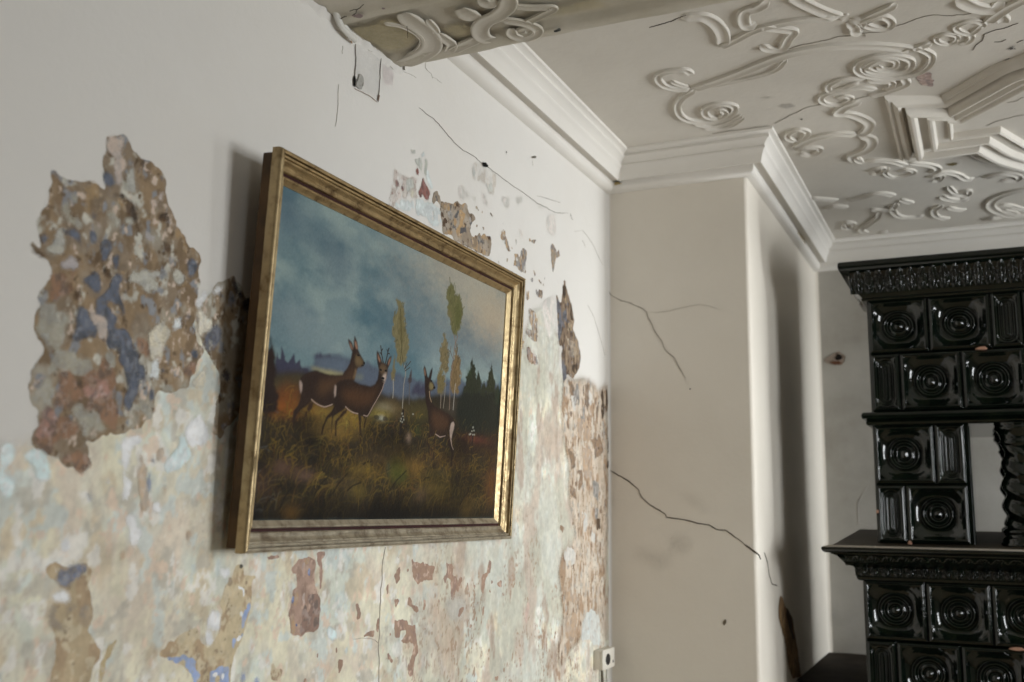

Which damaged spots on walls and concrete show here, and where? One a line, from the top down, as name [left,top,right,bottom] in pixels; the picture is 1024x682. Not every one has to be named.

crack [789,13,1023,51]
crack [713,104,821,134]
crack [420,108,603,265]
peeling [0,134,250,563]
spalling [389,148,609,666]
crack [588,292,717,377]
crack [610,470,777,586]
peeling [46,561,117,682]
peeling [159,564,282,682]
peeling [288,551,348,673]
peeling [364,557,504,677]